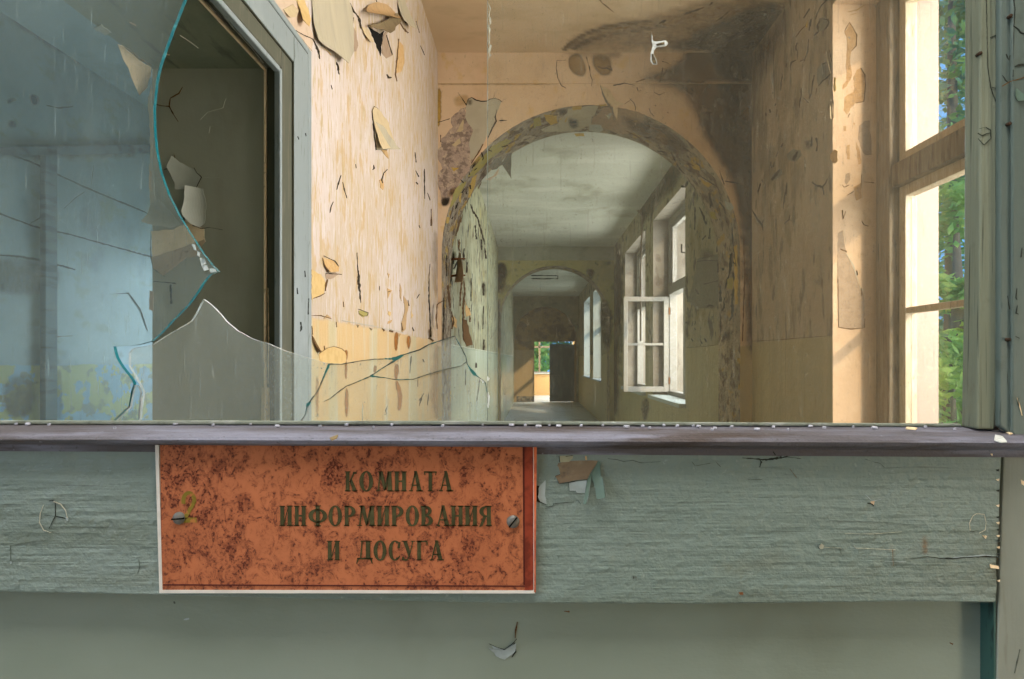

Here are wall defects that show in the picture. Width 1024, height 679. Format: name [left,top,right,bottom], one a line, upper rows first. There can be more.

peeling [274,0,417,81]
peeling [118,44,222,311]
crack [153,87,226,133]
peeling [372,106,400,190]
flaking render [432,97,512,350]
water stain [563,3,785,348]
flaking render [826,5,874,201]
peeling [297,256,414,353]
water stain [498,263,507,347]
water stain [599,244,622,412]
peeling [537,455,607,507]
crack [746,451,801,480]